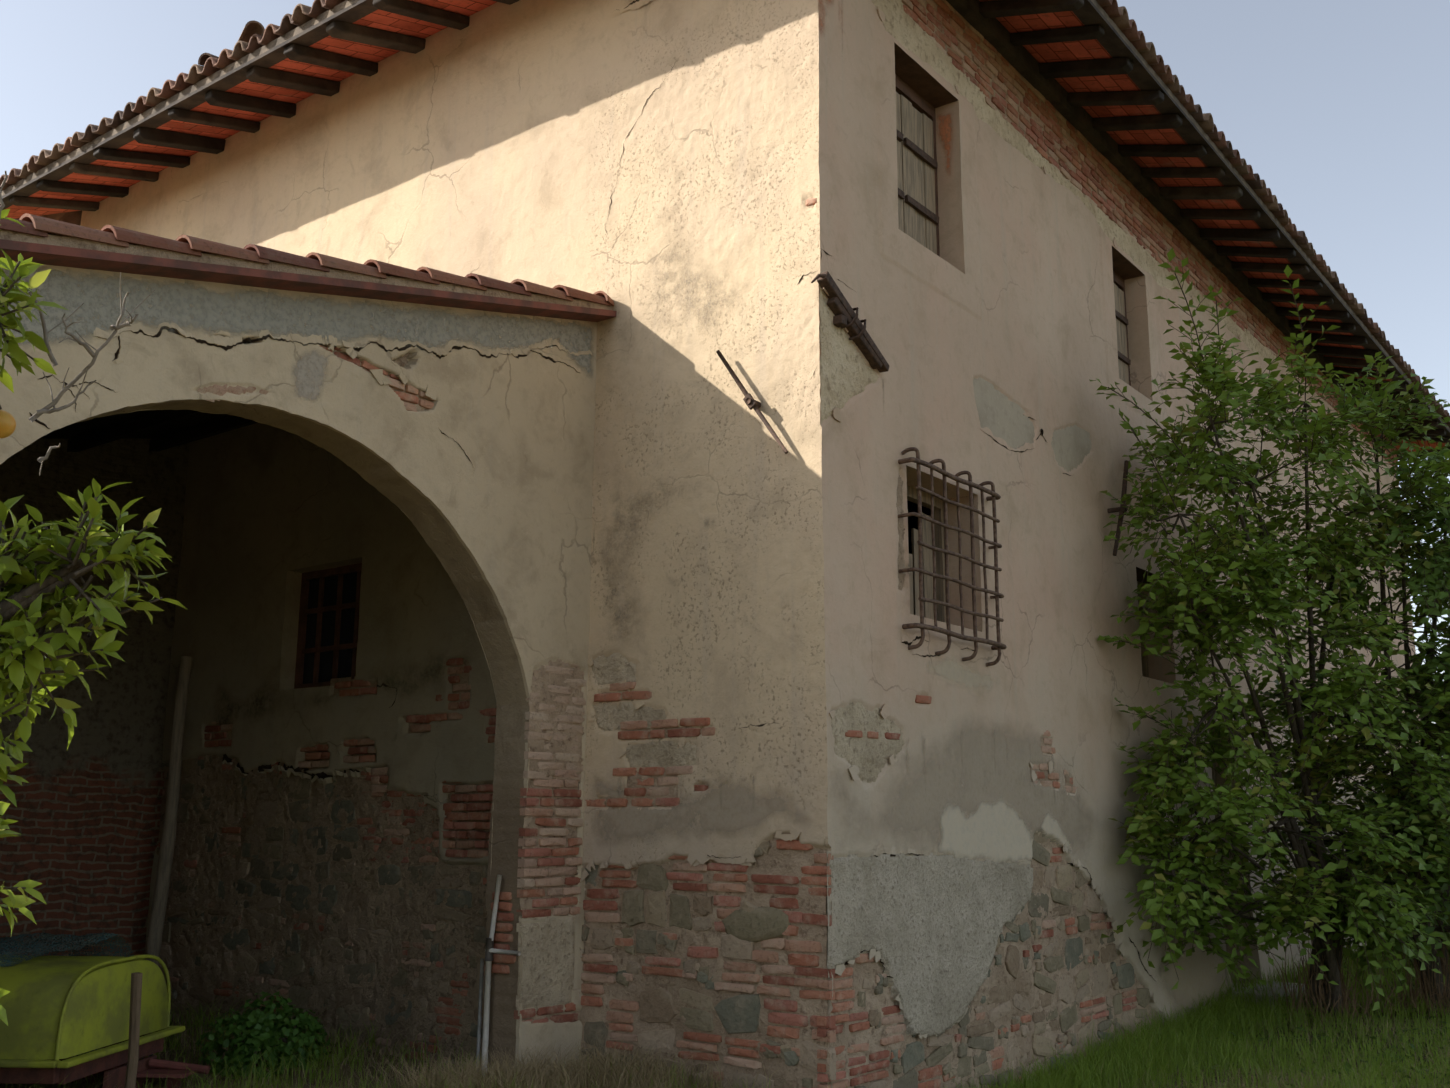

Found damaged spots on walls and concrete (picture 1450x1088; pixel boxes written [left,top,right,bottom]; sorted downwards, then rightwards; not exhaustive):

flaking render [872,0,1398,469]
crack [29,321,592,429]
flaking render [320,343,437,412]
peeling [819,285,879,424]
flaking render [403,658,496,743]
flaking render [157,682,1165,1088]